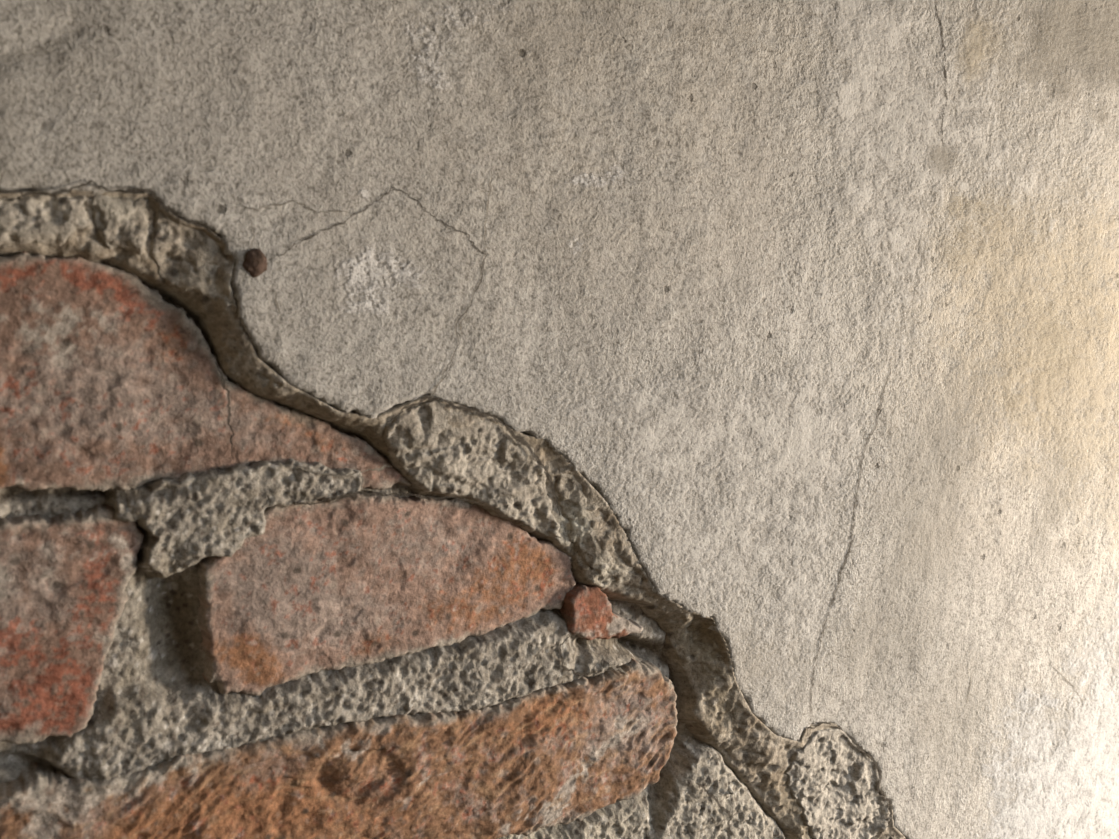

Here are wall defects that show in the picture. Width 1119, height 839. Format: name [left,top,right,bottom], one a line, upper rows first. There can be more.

crack [0,170,223,241]
crack [213,363,235,458]
crack [227,166,560,516]
spalling [0,190,906,839]
crack [807,386,895,839]
peeling [983,577,1119,839]